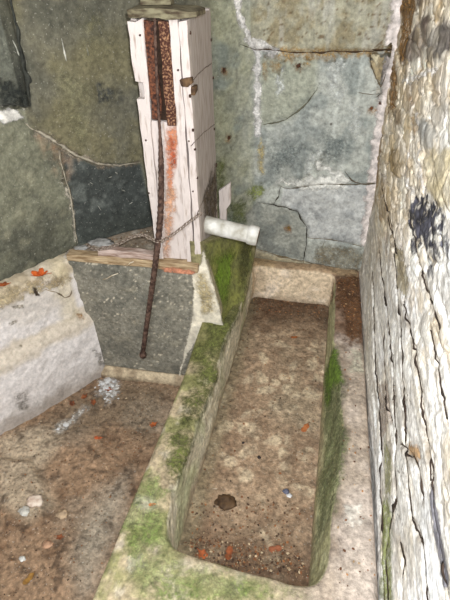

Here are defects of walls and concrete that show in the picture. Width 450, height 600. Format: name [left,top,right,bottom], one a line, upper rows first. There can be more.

crack [240,44,392,54]
crack [263,83,320,125]
rust [164,127,178,256]
damp [408,194,449,276]
crack [258,172,450,600]